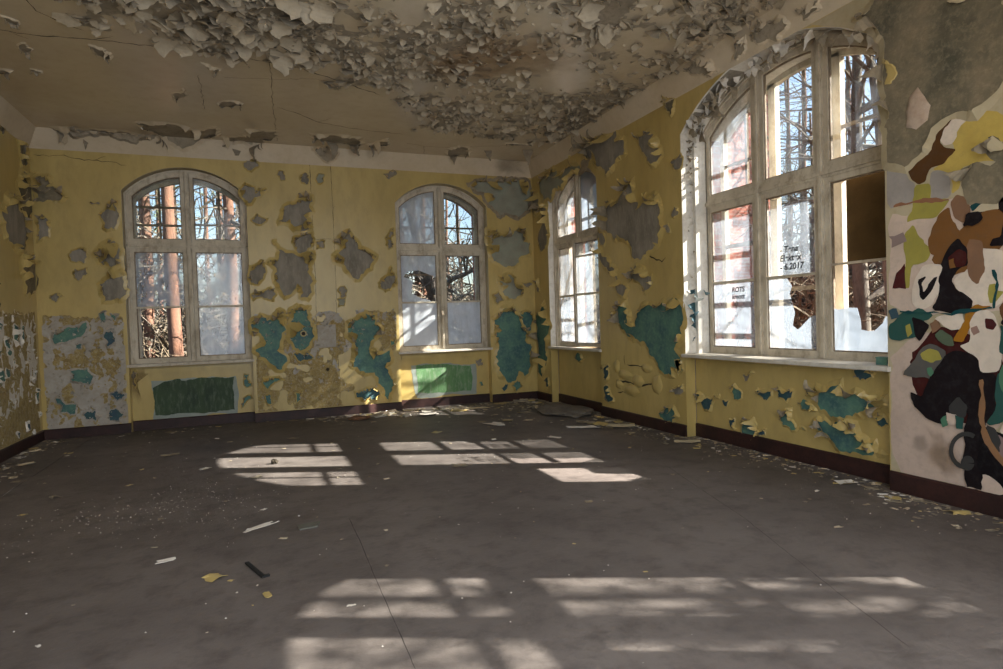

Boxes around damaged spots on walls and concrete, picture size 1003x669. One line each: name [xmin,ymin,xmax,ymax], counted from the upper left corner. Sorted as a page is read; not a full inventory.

peeling [0,125,70,299]
peeling [0,198,138,449]
flaking render [48,0,1003,460]